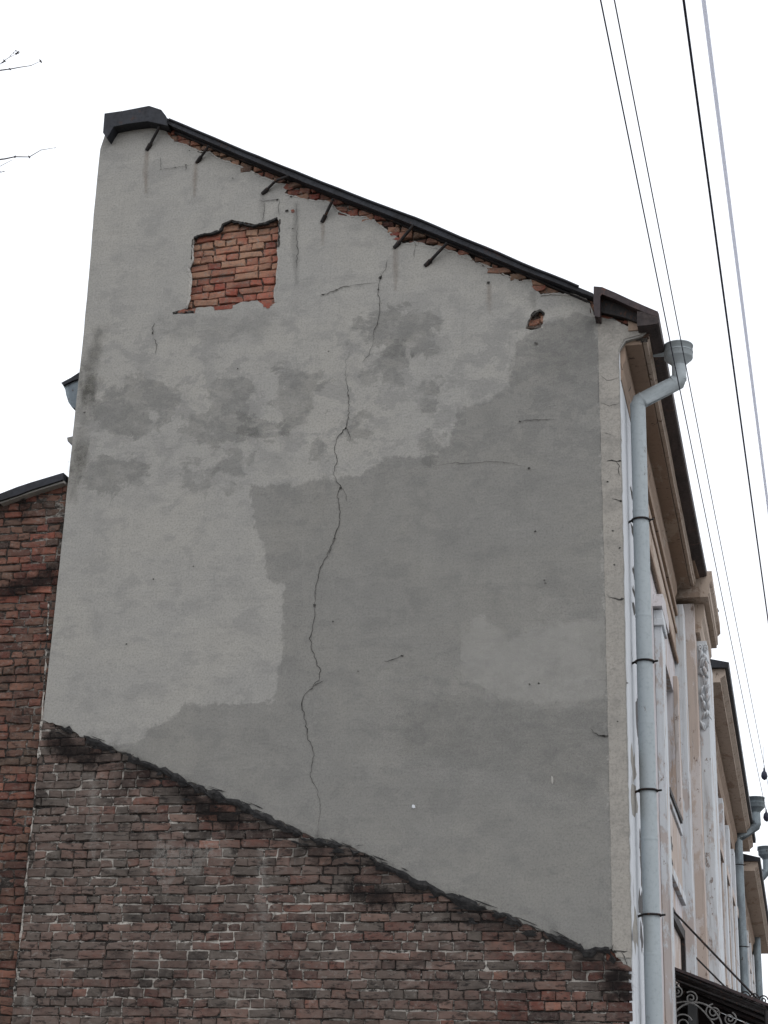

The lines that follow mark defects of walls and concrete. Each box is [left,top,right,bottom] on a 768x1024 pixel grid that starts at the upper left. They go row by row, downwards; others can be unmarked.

spalling [165,132,628,325]
spalling [527,309,545,328]
crack [301,260,388,833]